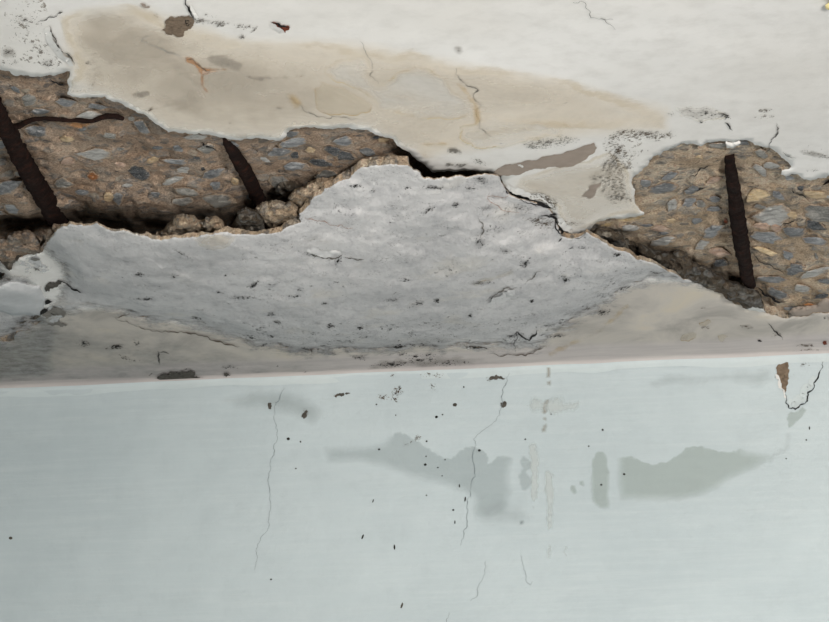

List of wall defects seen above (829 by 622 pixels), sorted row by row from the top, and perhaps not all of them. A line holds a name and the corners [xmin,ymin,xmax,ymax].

peeling [162,14,257,39]
water stain [206,60,284,96]
spalling [0,48,597,273]
peeling [583,184,601,199]
crack [487,184,580,241]
spalling [590,140,829,317]
crack [306,247,364,261]
crack [40,300,52,315]
peeling [42,306,67,327]
crack [470,331,547,357]
peeling [775,362,789,398]
crack [785,362,823,410]